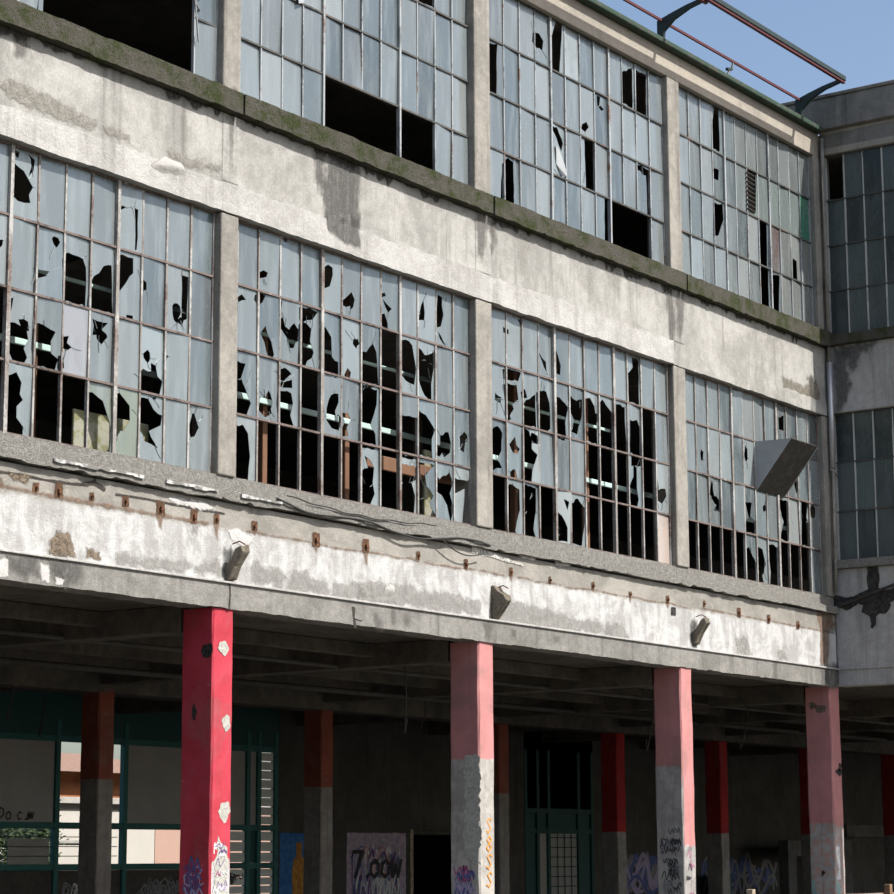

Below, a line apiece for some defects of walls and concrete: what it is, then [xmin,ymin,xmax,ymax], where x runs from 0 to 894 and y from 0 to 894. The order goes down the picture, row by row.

damp [290,138,441,246]
damp [452,201,567,255]
damp [577,251,811,344]
rust [0,482,219,538]
spalling [49,530,75,557]
rust [249,521,380,564]
flaking render [40,563,64,585]
rust [431,559,554,584]
rust [568,582,676,607]
spalling [833,566,894,628]
peeling [218,801,230,823]
peeling [462,754,482,864]